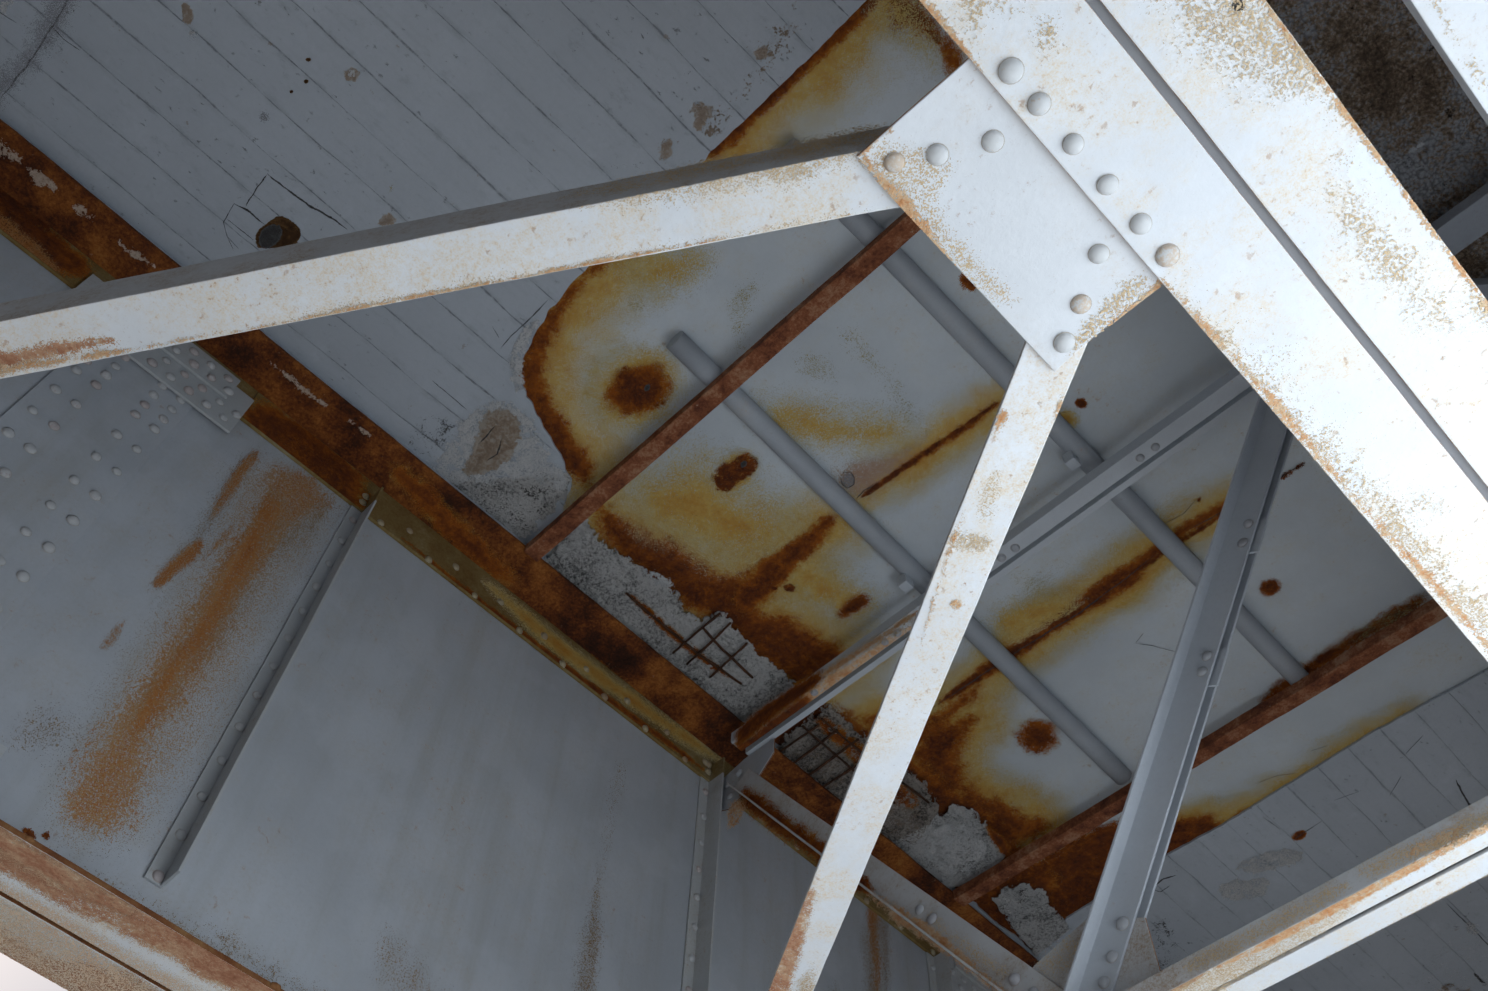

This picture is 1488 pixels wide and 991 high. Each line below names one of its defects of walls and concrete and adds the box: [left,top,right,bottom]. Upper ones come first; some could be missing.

corrosion [552,0,1067,307]
corrosion [0,206,860,512]
spalling [408,318,571,538]
corrosion [830,372,1009,522]
corrosion [1069,270,1488,674]
spalling [544,519,796,720]
corrosion [587,447,1002,751]
spalling [775,704,867,801]
spalling [880,770,1011,889]
corrosion [906,640,1092,860]
spalling [992,883,1070,957]
corrosion [974,816,1121,984]